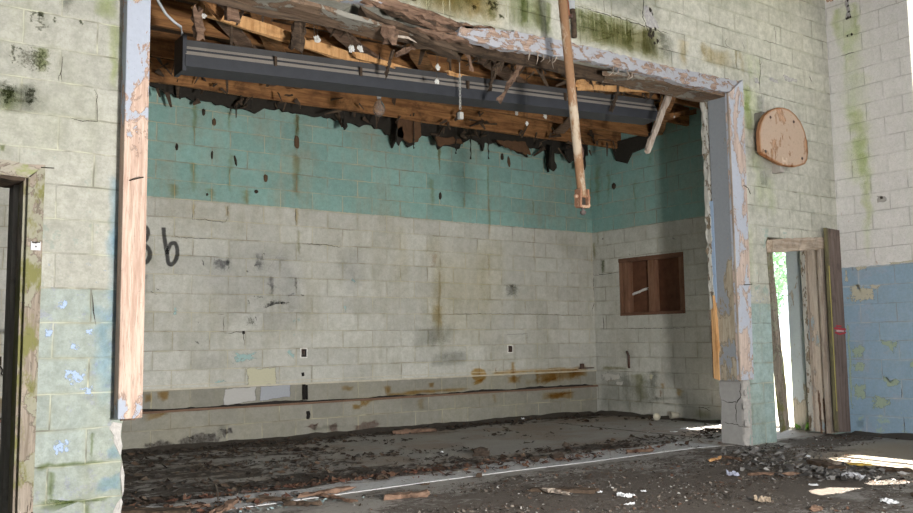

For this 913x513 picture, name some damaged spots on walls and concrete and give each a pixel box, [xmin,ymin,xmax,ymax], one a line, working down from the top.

water stain [1,85,35,104]
peeling [845,266,880,302]
peeling [847,324,891,409]
crack [698,383,742,427]